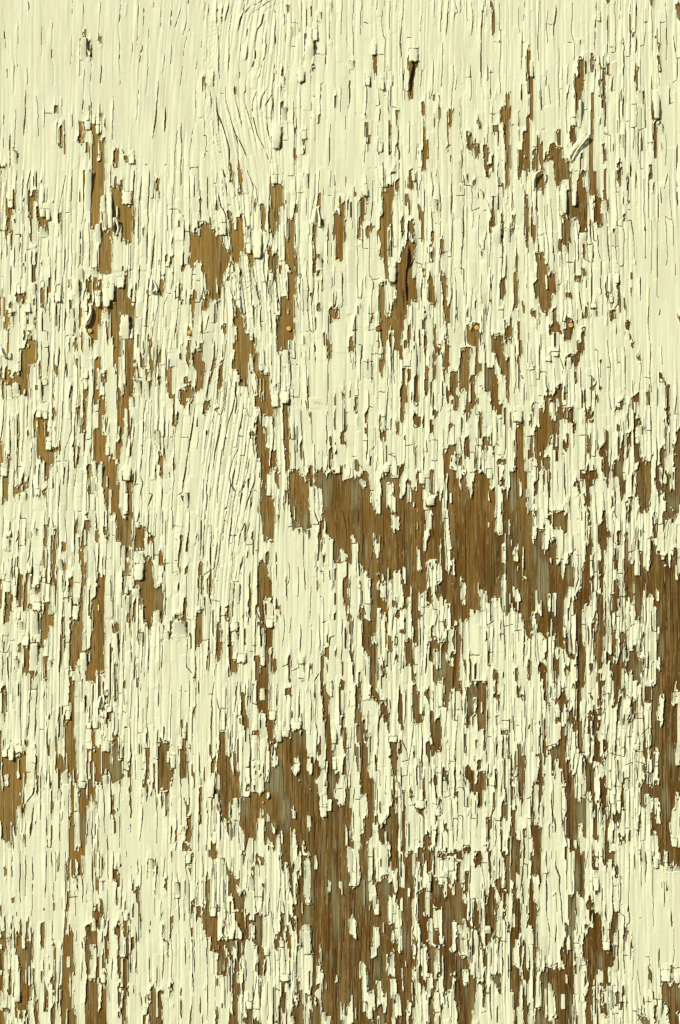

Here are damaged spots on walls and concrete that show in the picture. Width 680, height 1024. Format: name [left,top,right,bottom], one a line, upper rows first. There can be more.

peeling [0,106,305,1024]
crack [1,0,518,1024]
peeling [139,39,680,1024]
crack [415,433,678,1024]
crack [512,1,678,460]